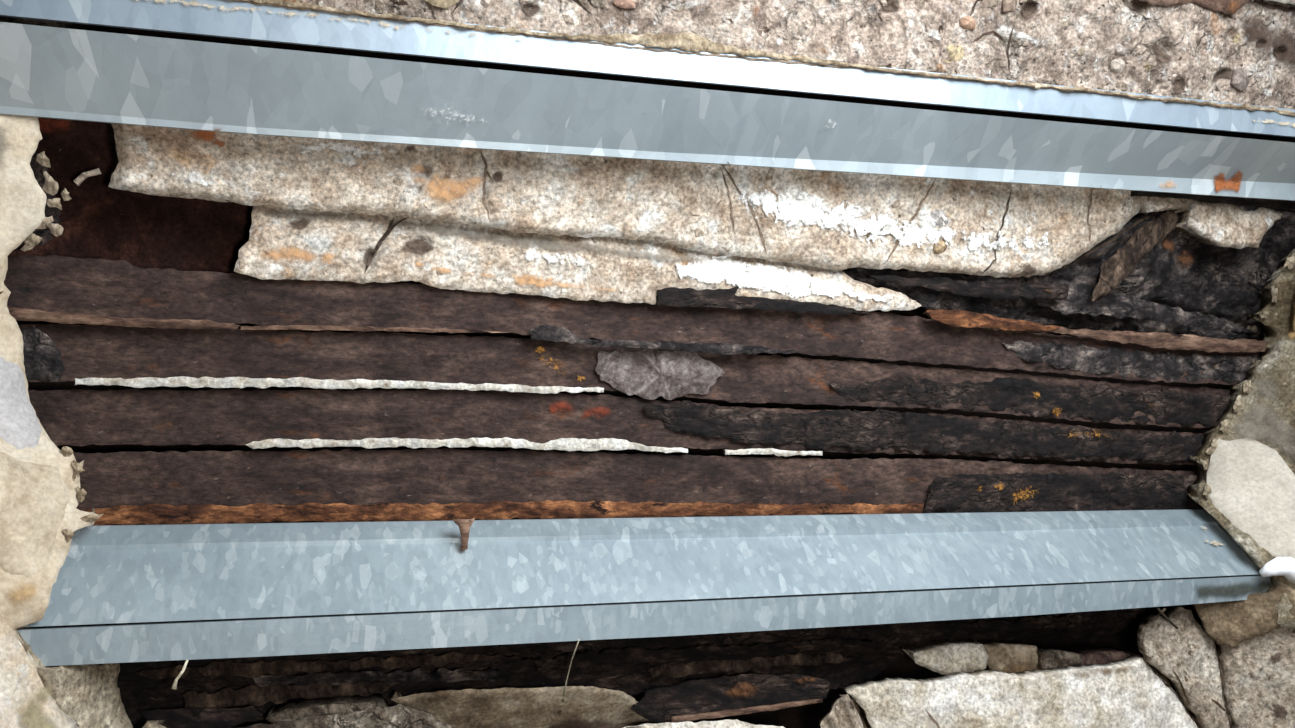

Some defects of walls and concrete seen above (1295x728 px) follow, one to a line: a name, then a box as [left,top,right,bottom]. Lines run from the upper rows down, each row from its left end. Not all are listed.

crack [236,0,1295,113]
peeling [296,141,379,158]
spalling [13,151,102,252]
peeling [172,172,213,187]
spalling [290,218,310,229]
spalling [364,247,376,266]
spalling [398,234,433,254]
peeling [525,248,596,268]
peeling [676,255,893,302]
peeling [739,184,1066,277]
spalling [1199,380,1254,500]
spalling [61,446,103,541]